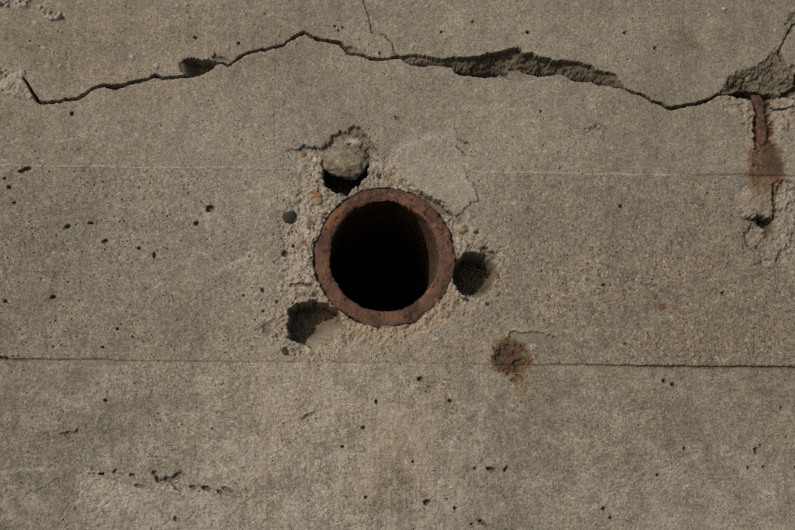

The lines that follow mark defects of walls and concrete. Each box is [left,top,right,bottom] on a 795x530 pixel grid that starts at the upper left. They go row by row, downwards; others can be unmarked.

spalling [0,66,33,102]
crack [21,0,727,112]
spalling [712,12,795,151]
corrosion [743,139,789,189]
spalling [255,122,511,367]
spalling [734,177,795,268]
corrosion [489,336,547,404]